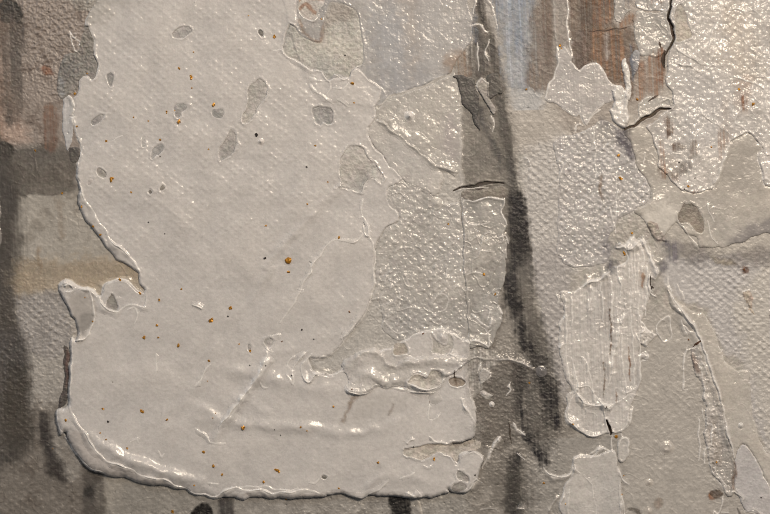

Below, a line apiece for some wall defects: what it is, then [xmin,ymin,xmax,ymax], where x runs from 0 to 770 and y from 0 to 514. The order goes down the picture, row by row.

peeling [57,25,99,100]
peeling [272,0,363,125]
corrosion [568,0,663,99]
crack [659,0,675,68]
crack [624,95,672,131]
spalling [68,147,80,163]
spalling [333,146,384,195]
crack [453,181,505,191]
spalling [678,203,704,233]
peeling [58,345,70,408]
spalling [408,371,465,389]
peeling [403,436,481,461]